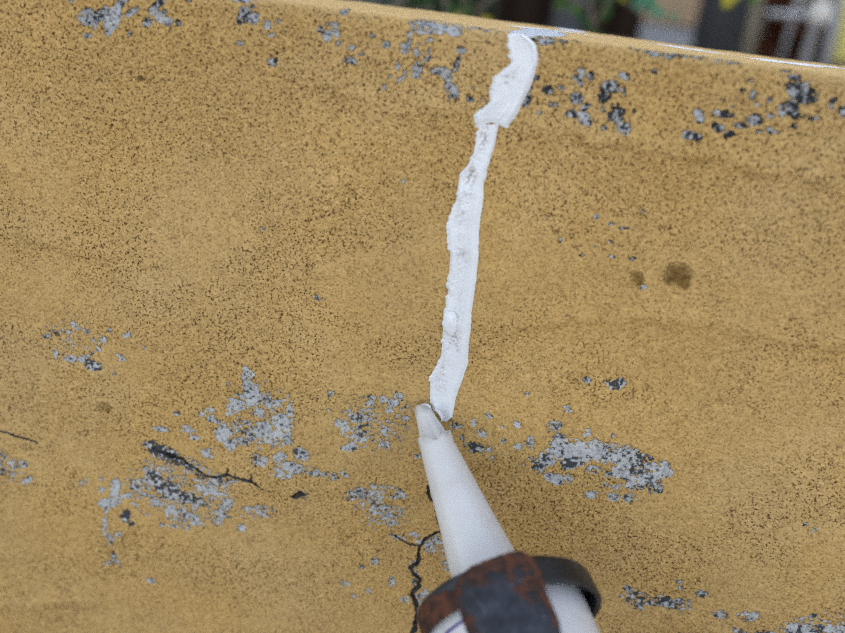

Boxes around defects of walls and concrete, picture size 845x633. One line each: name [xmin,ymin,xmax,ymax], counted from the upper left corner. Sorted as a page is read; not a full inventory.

peeling [77,0,182,39]
peeling [522,68,636,135]
peeling [681,69,845,143]
crack [0,431,38,444]
peeling [97,366,349,568]
crack [153,448,308,499]
peeling [327,391,410,454]
peeling [501,419,674,503]
peeling [344,483,412,540]
crack [391,485,441,633]
peeling [620,580,708,611]
peeling [712,610,845,633]